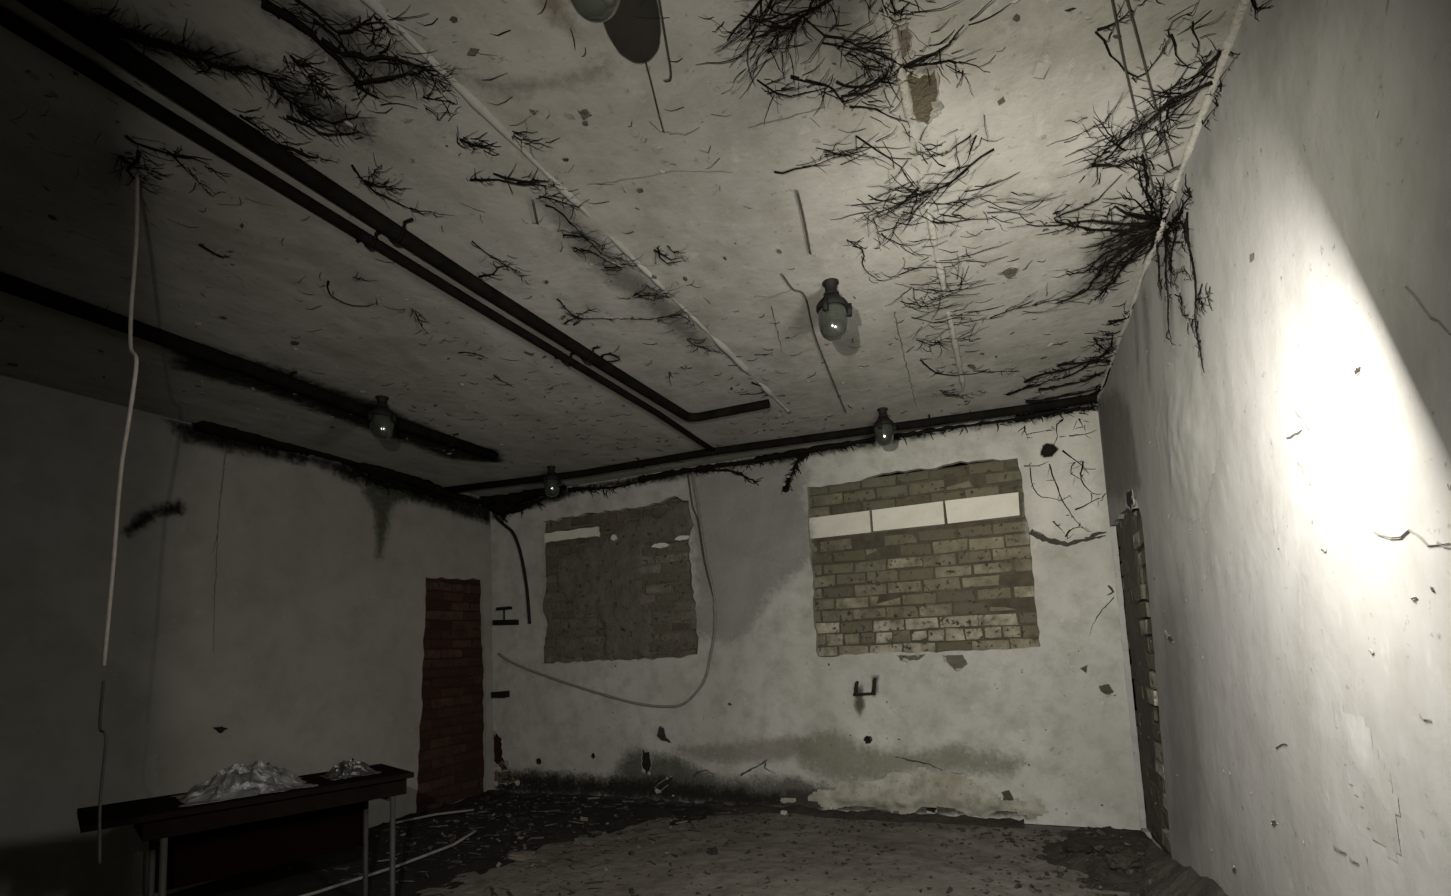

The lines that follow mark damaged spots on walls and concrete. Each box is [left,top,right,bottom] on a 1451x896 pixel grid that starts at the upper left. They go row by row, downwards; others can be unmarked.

flaking render [887,8,943,136]
crack [1029,529,1106,547]
damp [496,752,964,814]